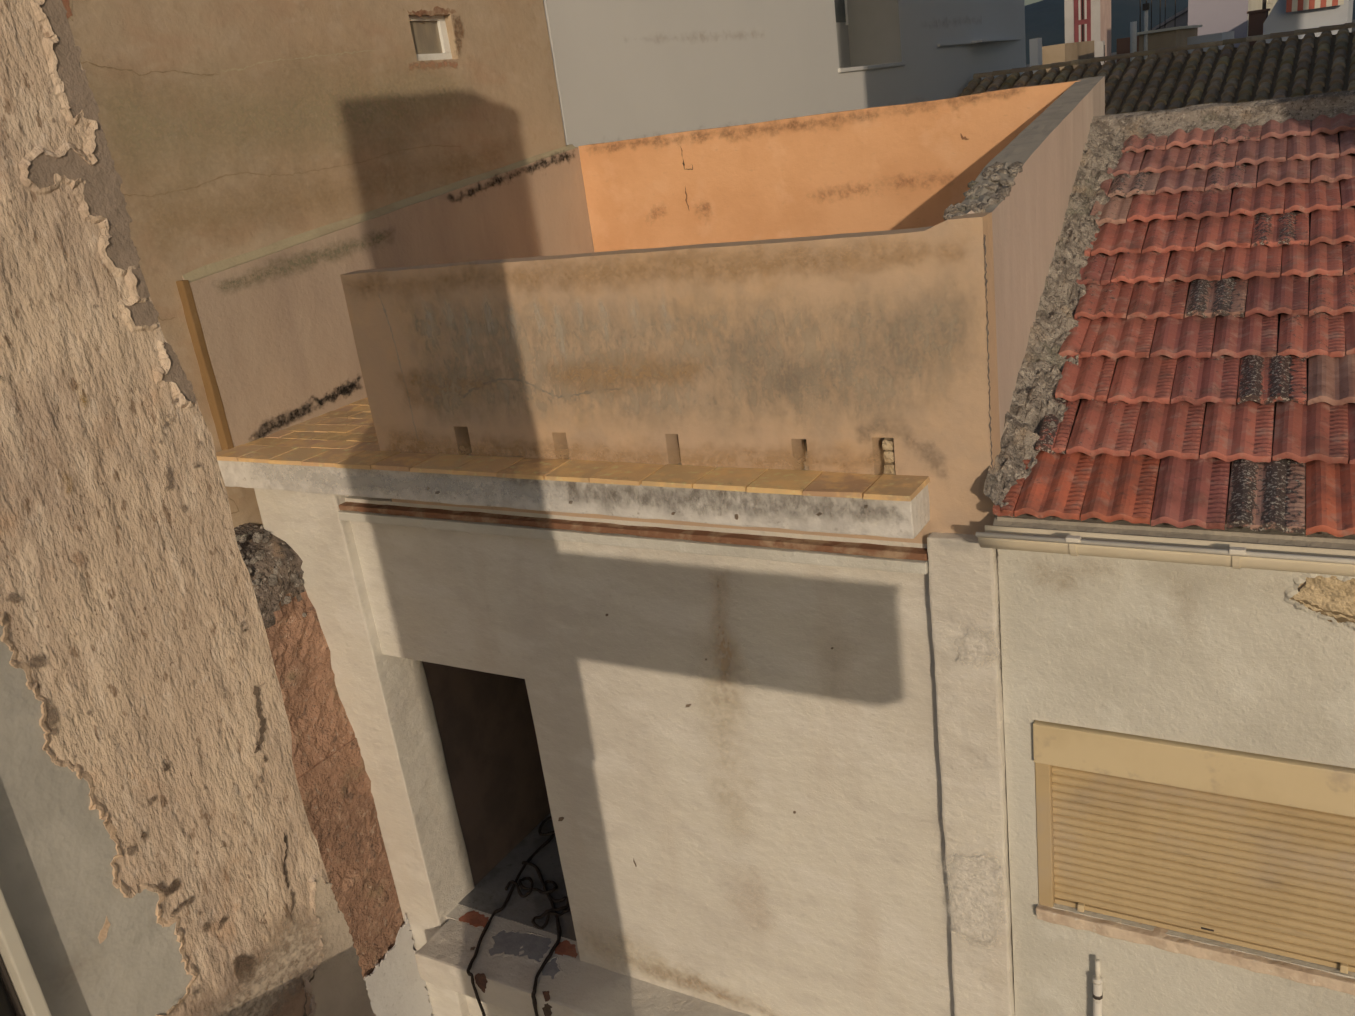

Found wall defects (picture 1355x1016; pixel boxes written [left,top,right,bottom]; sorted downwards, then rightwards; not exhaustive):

mould [449,153,574,200]
spalling [943,161,1023,220]
peeling [18,0,198,443]
peeling [166,467,174,490]
spalling [1283,573,1355,632]
spalling [208,523,385,1016]
spalling [0,611,198,1016]